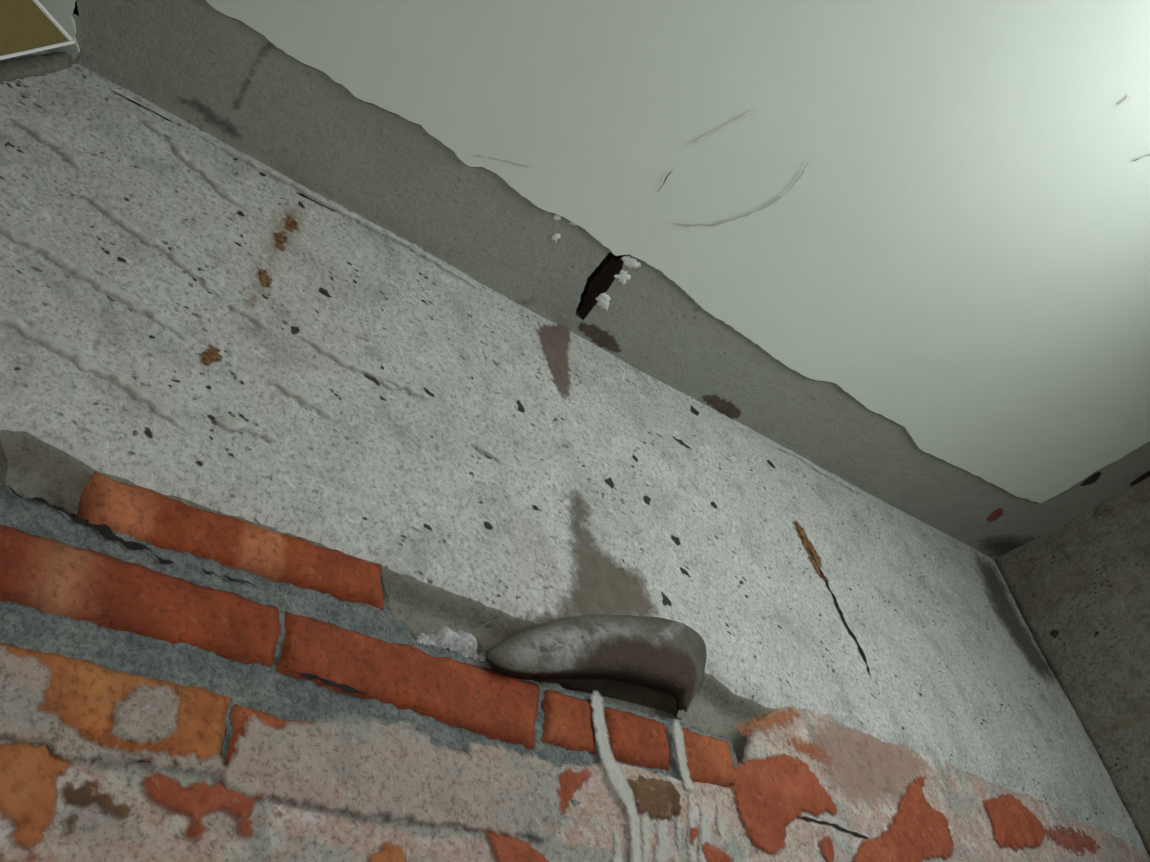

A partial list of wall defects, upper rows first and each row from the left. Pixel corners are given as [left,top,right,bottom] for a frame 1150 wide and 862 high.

corrosion [258,268,272,287]
corrosion [274,216,298,251]
peeling [72,0,1150,559]
crack [674,163,808,227]
corrosion [197,345,222,375]
water stain [538,324,571,397]
water stain [477,497,655,650]
crack [794,521,872,679]
peeling [0,646,592,862]
water stain [592,691,723,862]
spalling [732,706,955,862]
spalling [984,794,1100,856]